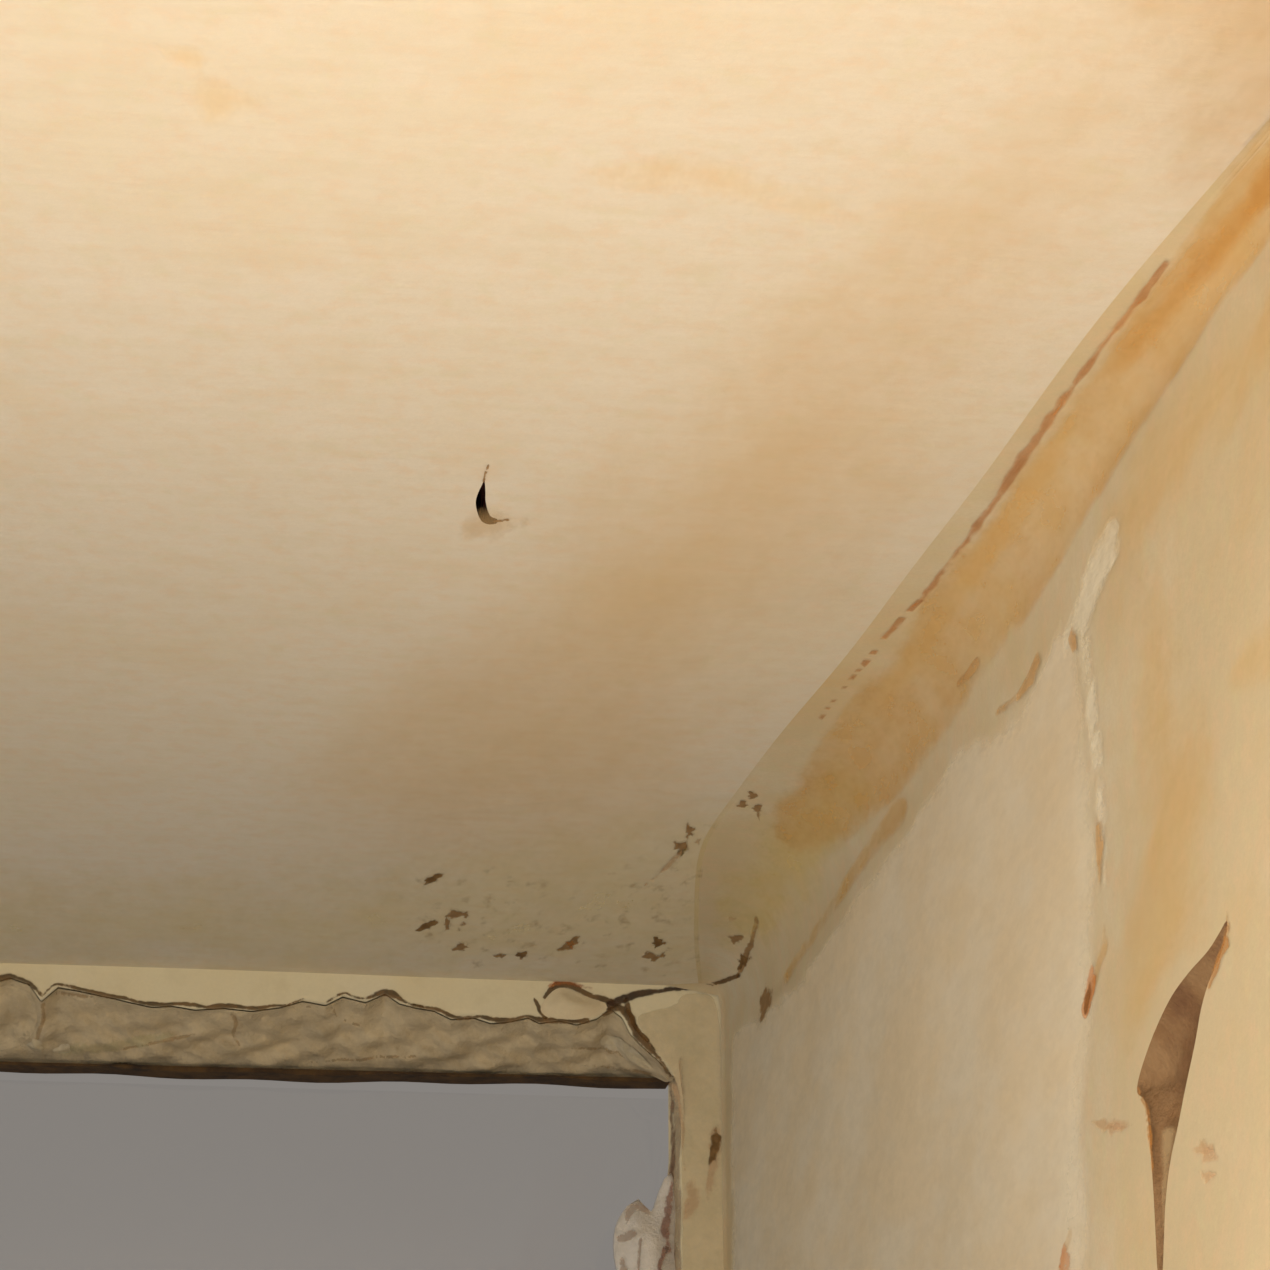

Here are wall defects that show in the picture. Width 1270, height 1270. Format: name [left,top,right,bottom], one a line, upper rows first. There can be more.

peeling [674,825,695,853]
peeling [416,911,468,931]
peeling [557,936,580,951]
peeling [642,937,666,961]
crack [606,974,740,1043]
spalling [0,974,675,1082]
spalling [613,1174,676,1270]